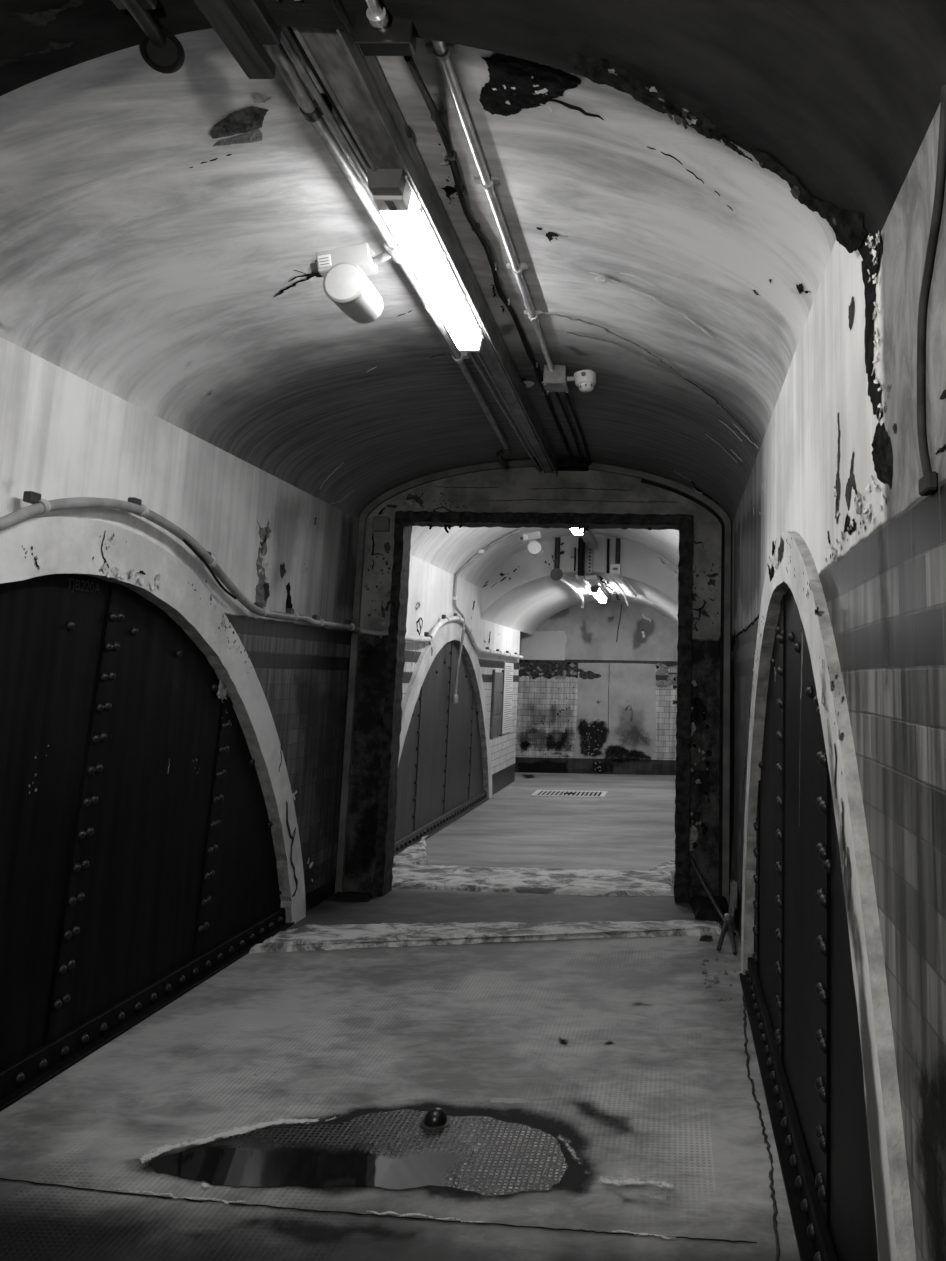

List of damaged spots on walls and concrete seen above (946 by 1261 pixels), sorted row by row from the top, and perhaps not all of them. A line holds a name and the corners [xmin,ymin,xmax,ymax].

peeling [210,93,272,146]
crack [274,260,322,297]
spalling [479,51,896,560]
peeling [256,518,293,608]
peeling [767,537,811,597]
damp [518,682,651,779]
crack [0,995,780,1261]